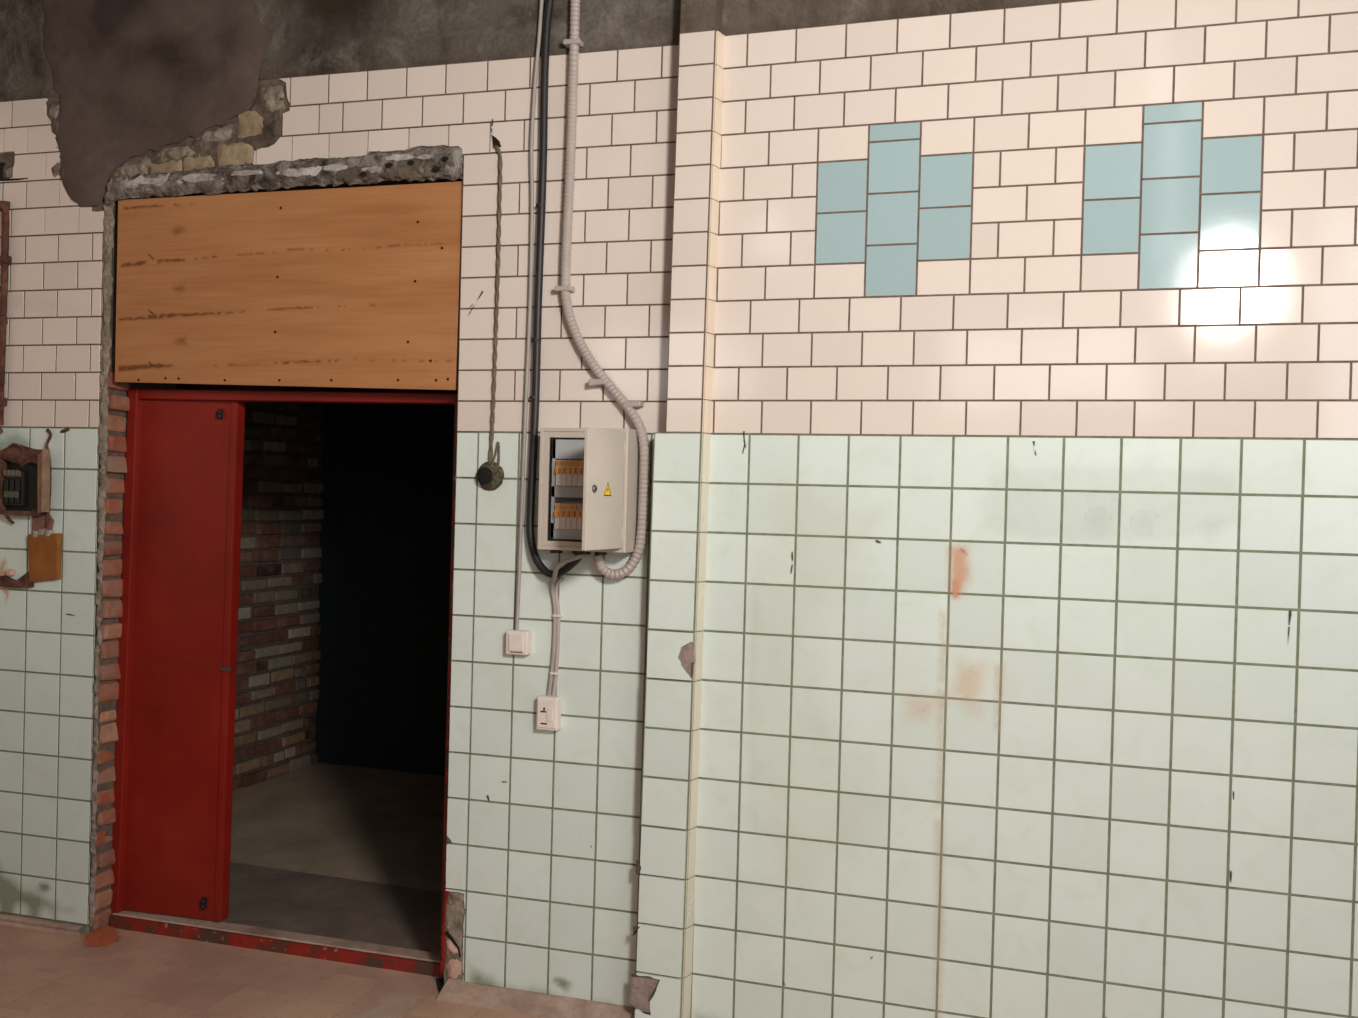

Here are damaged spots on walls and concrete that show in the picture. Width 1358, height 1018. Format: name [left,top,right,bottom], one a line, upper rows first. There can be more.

spalling [114,85,455,191]
spalling [88,198,115,927]
rust [953,551,965,596]
spalling [679,642,695,678]
spalling [440,890,465,979]
spalling [630,974,659,1015]